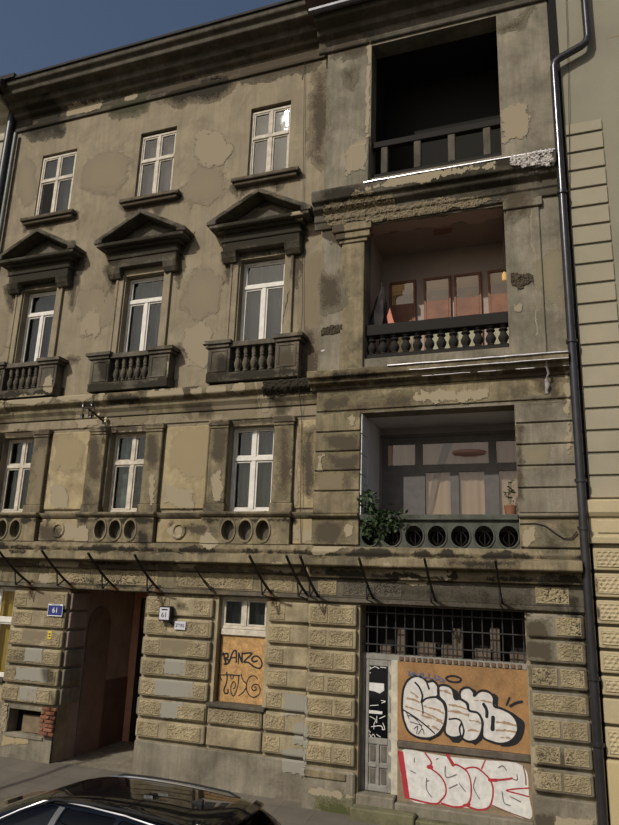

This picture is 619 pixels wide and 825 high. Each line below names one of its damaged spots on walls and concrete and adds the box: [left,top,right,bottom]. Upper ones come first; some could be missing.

damp [15,84,67,142]
flaking render [66,98,104,116]
damp [101,5,369,172]
flaking render [500,103,531,144]
flaking render [510,148,554,168]
flaking render [320,161,504,237]
flaking render [291,211,315,232]
flaking render [511,273,534,289]
flaking render [413,388,490,405]
damp [0,151,590,716]
flaking render [149,474,195,513]